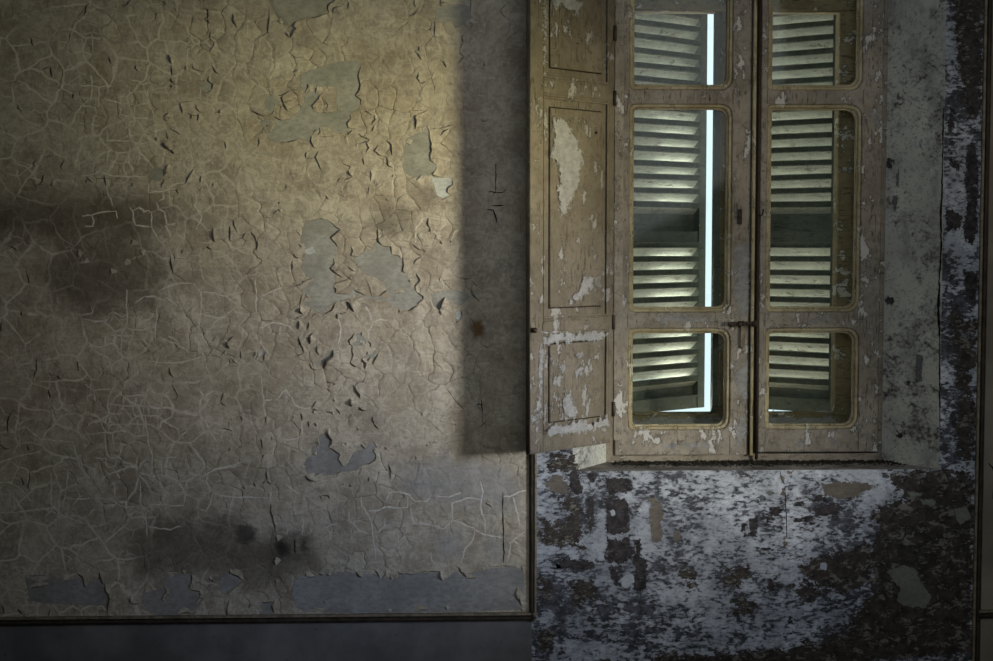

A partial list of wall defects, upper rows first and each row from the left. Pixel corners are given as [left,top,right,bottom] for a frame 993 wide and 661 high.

peeling [258,0,354,42]
peeling [250,60,367,149]
peeling [399,125,458,202]
crack [0,0,527,584]
peeling [290,213,471,376]
peeling [534,329,611,443]
peeling [302,427,381,491]
spalling [537,451,681,609]
peeling [292,561,526,614]